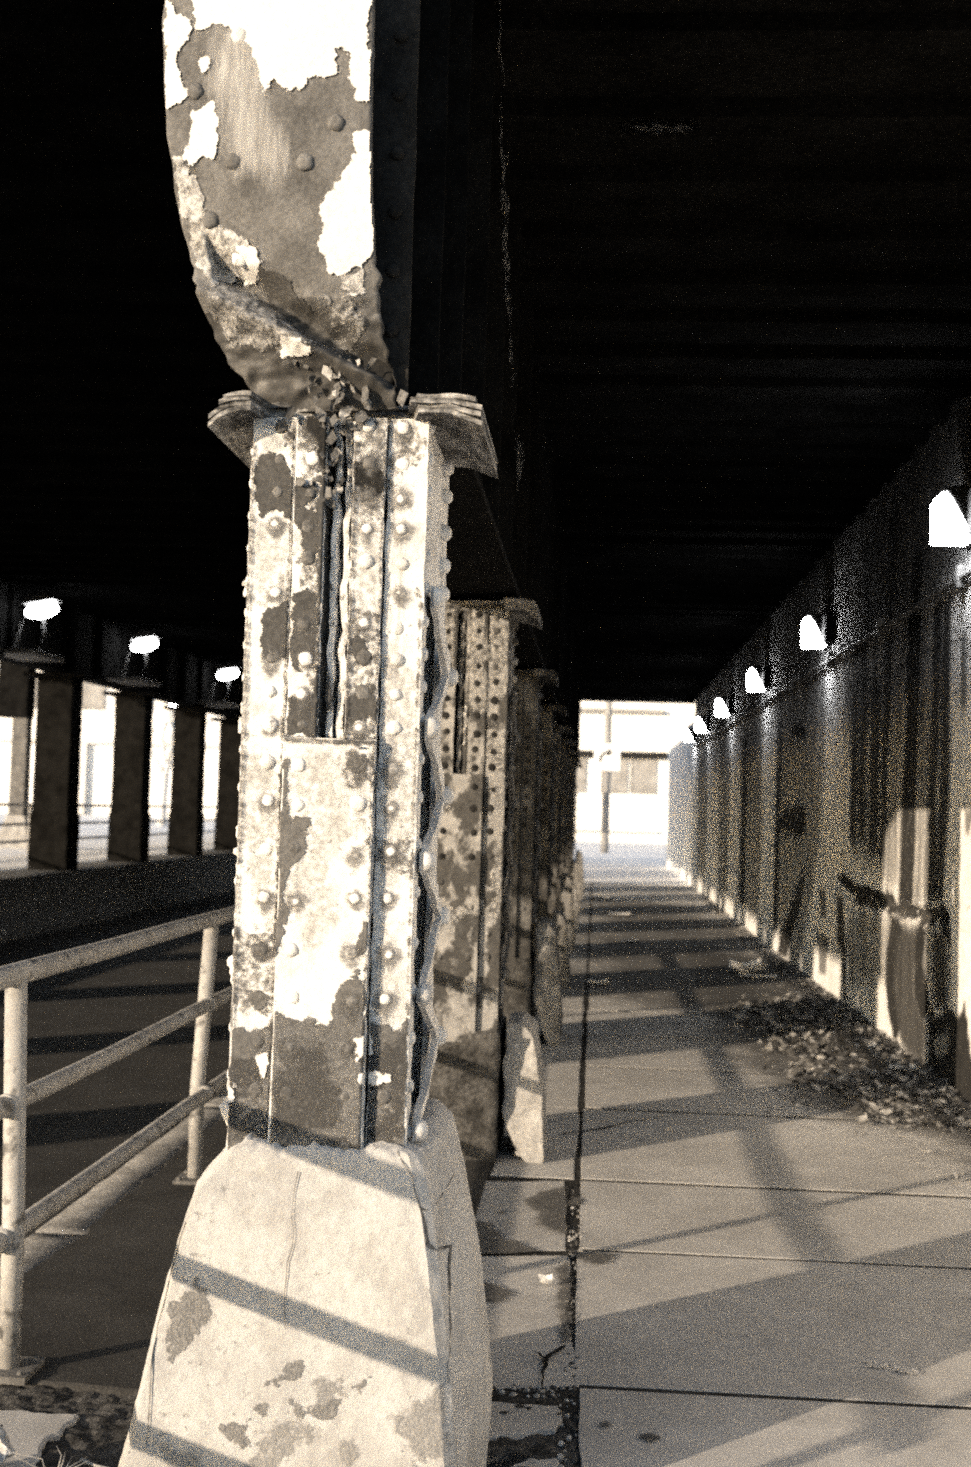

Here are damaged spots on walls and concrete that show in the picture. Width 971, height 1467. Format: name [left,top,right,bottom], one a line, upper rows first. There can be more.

peeling [162,0,373,296]
peeling [251,437,319,554]
peeling [246,756,314,964]
peeling [259,559,319,672]
corrosion [205,267,426,1067]
peeling [286,684,410,846]
peeling [349,634,370,665]
leakage [591,398,971,1143]
peeling [227,911,408,1150]
crack [535,1345,566,1387]